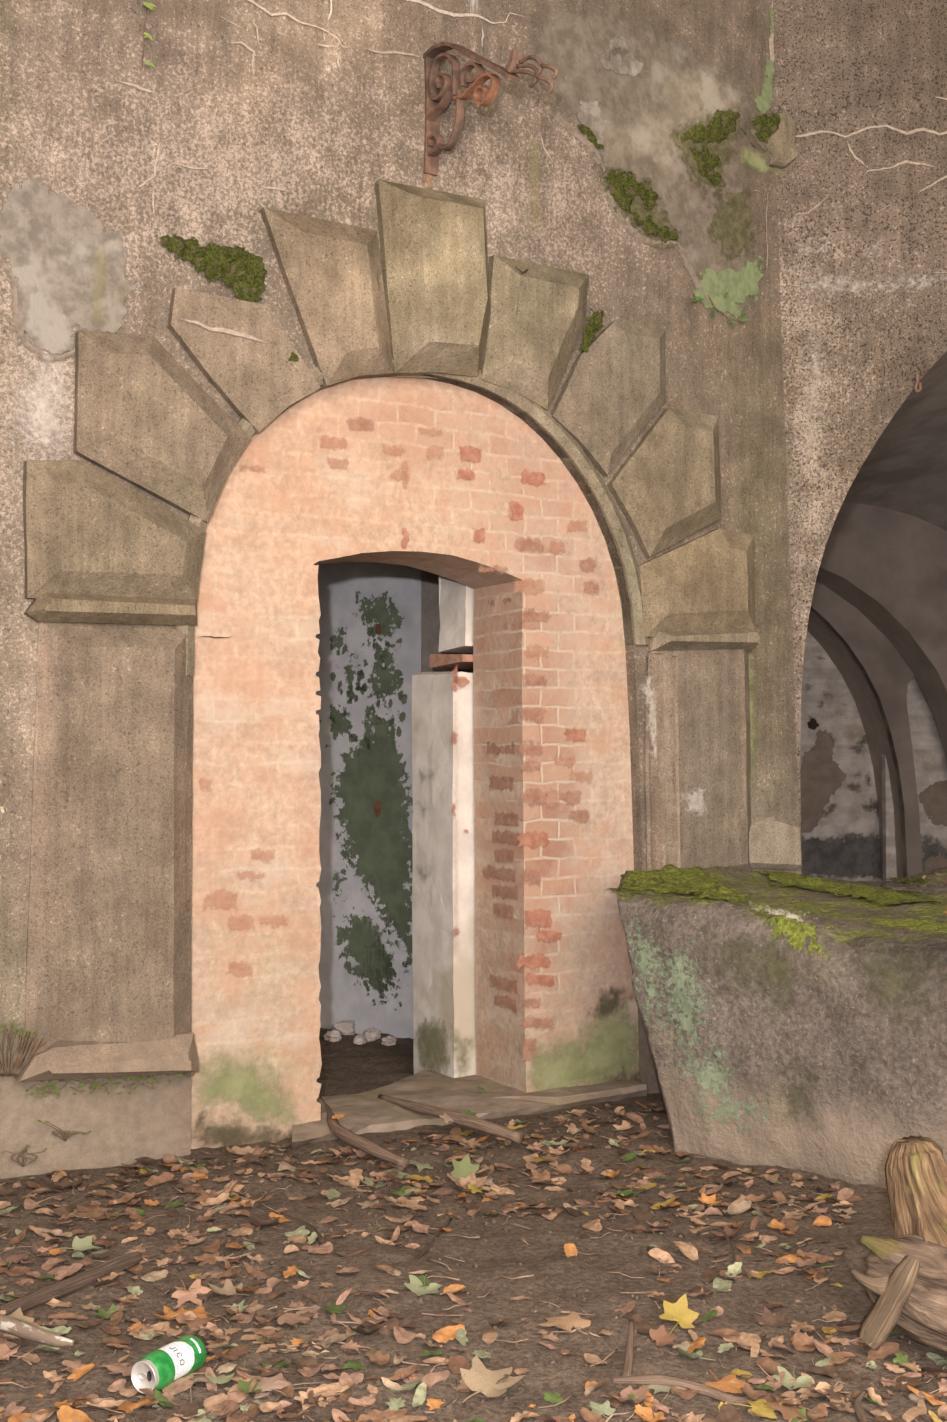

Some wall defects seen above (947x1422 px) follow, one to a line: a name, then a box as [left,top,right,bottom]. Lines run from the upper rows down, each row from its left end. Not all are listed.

crack [221,0,420,80]
crack [406,0,525,46]
crack [768,0,776,87]
crack [795,97,947,211]
spalling [0,178,137,361]
peeling [458,446,481,480]
peeling [509,501,523,520]
peeling [521,469,545,486]
peeling [515,521,587,555]
peeling [580,558,599,594]
peeling [319,591,413,1014]
peeling [800,718,882,878]